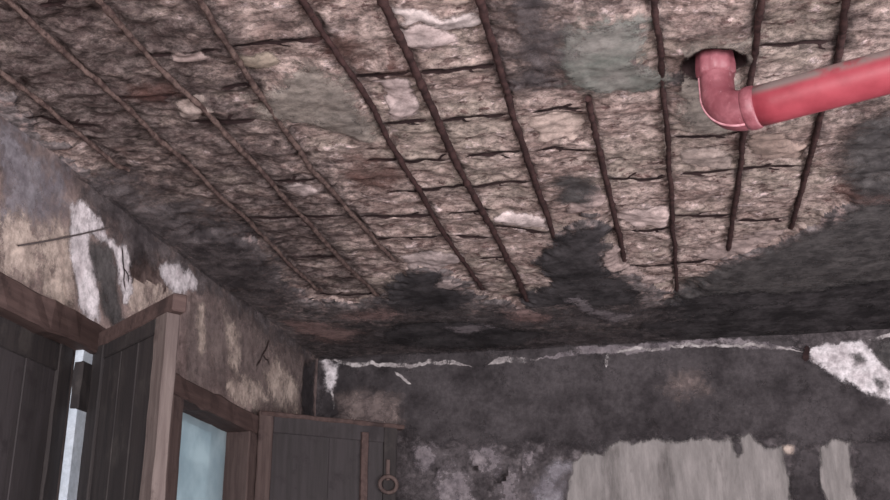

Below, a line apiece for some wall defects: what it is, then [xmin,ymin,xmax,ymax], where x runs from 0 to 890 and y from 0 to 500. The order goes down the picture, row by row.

damp [0,200,173,325]
crack [235,181,544,261]
rust [298,0,486,291]
spalling [0,0,890,343]
rust [376,0,529,302]
crack [356,63,560,87]
rust [475,0,557,246]
rust [651,0,679,292]
damp [322,359,399,424]
crack [326,337,800,384]
peeling [533,434,794,500]
peeling [820,439,857,500]